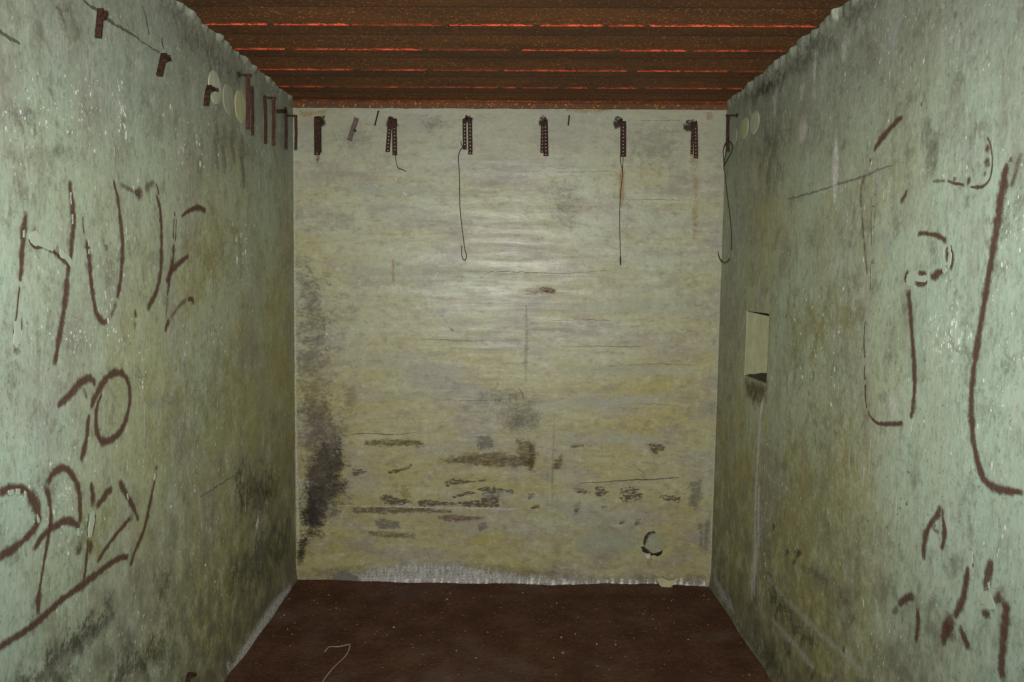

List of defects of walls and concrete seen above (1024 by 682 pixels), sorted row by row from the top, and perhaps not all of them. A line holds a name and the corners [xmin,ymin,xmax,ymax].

water stain [447,436,534,470]
water stain [297,438,347,565]
water stain [353,506,487,531]